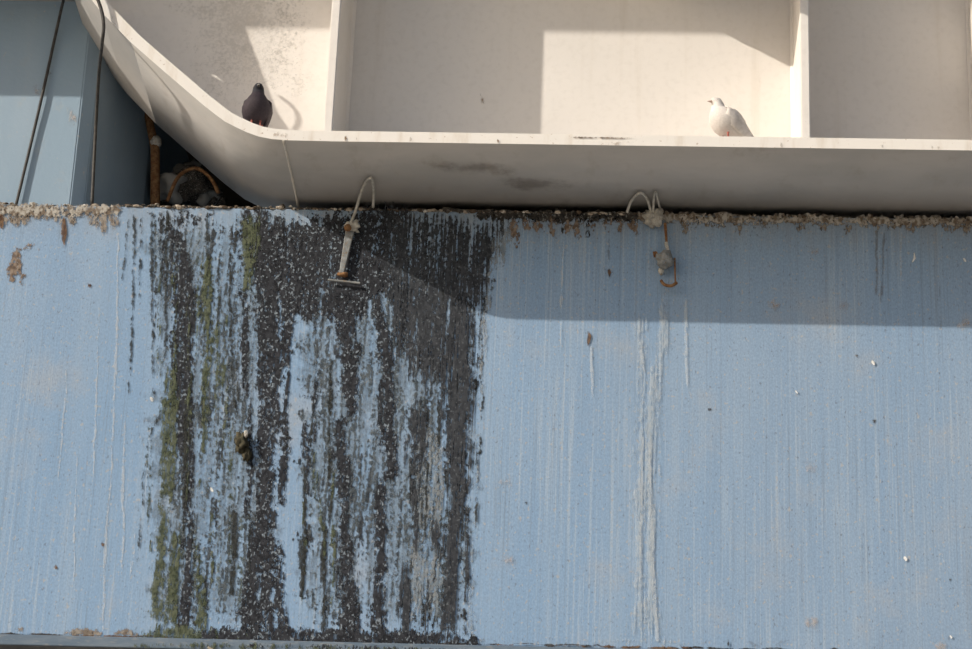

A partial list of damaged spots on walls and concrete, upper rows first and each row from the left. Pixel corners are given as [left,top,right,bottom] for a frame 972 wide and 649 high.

leakage [121,202,508,645]